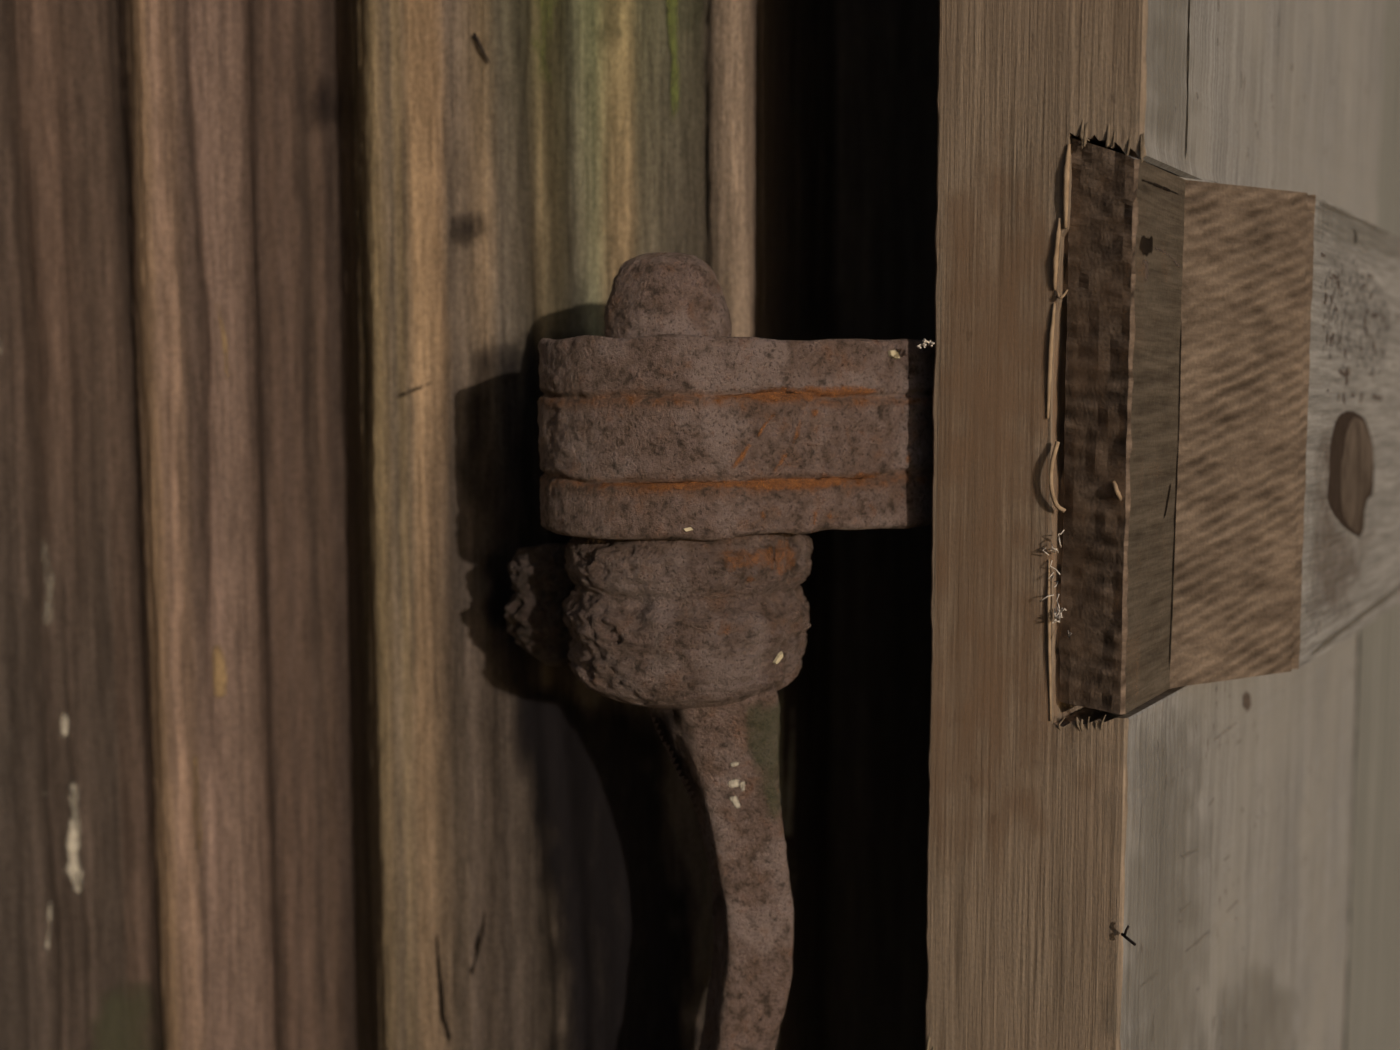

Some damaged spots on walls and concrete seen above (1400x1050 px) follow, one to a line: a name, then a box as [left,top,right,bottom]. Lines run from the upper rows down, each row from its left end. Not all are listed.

peeling [1320,252,1390,404]
corrosion [716,387,874,415]
corrosion [603,423,874,489]